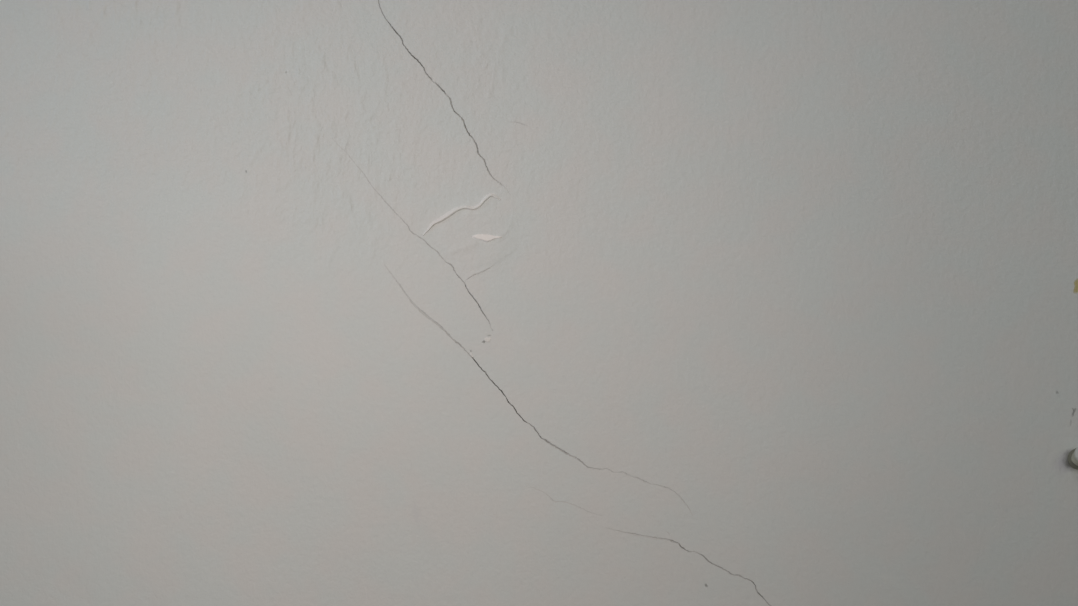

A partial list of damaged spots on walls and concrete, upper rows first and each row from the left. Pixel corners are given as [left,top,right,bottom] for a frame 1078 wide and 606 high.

crack [378,0,510,194]
crack [332,138,493,331]
crack [384,264,693,516]
crack [606,527,771,606]